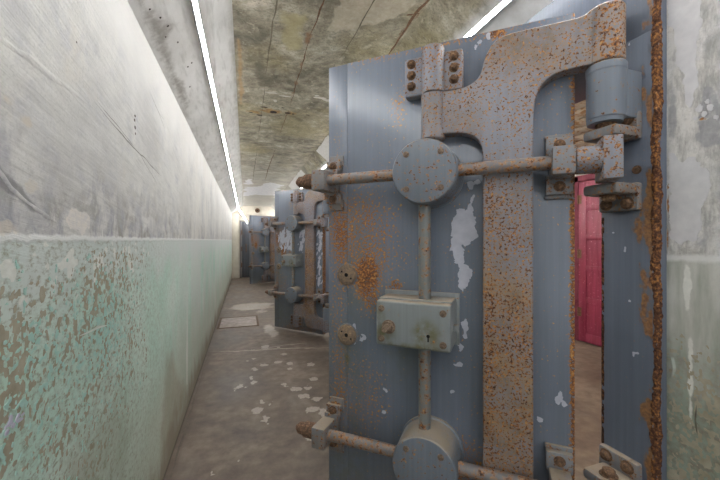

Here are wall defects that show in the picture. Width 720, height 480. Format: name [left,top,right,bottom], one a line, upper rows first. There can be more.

crack [258,0,278,135]
water stain [234,7,314,106]
crack [280,0,325,133]
crack [327,0,375,77]
crack [389,0,430,54]
crack [97,105,160,183]
peeling [0,239,164,480]